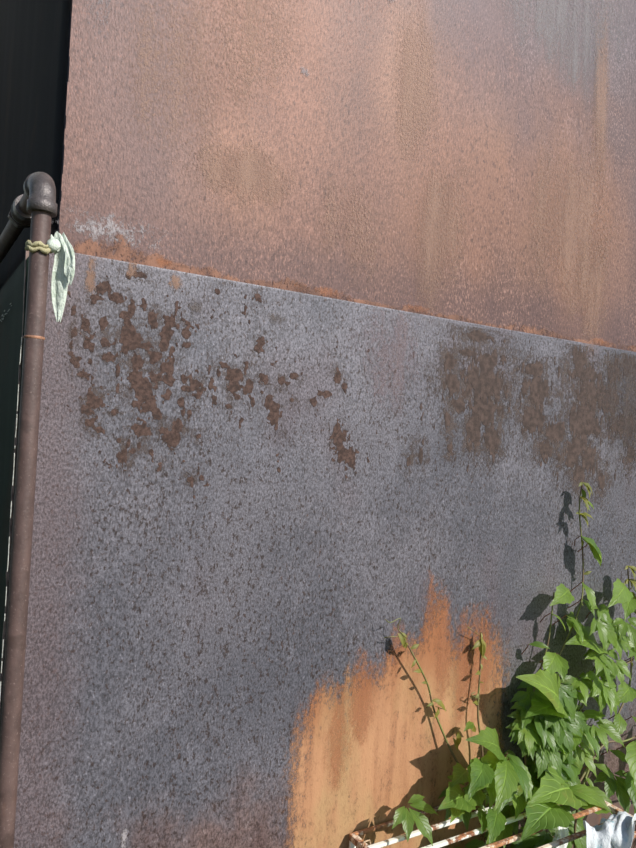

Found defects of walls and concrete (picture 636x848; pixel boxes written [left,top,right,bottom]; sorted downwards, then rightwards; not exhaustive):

corrosion [73,234,636,352]
corrosion [287,580,504,848]